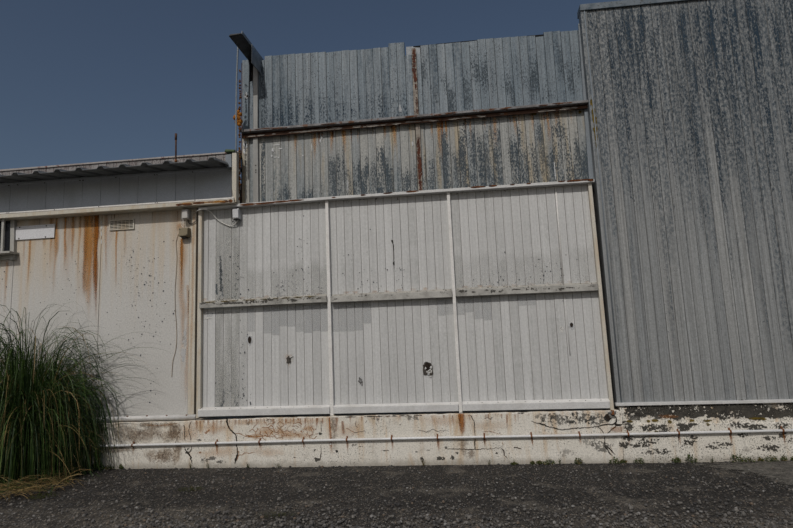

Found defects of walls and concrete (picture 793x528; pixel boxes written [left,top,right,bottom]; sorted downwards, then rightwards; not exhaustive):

damp [261,66,407,128]
rust [405,48,418,118]
damp [432,45,581,112]
damp [588,0,793,209]
rust [407,139,422,193]
damp [277,117,589,204]
rust [84,215,99,290]
crack [226,418,323,462]
crack [532,421,679,455]